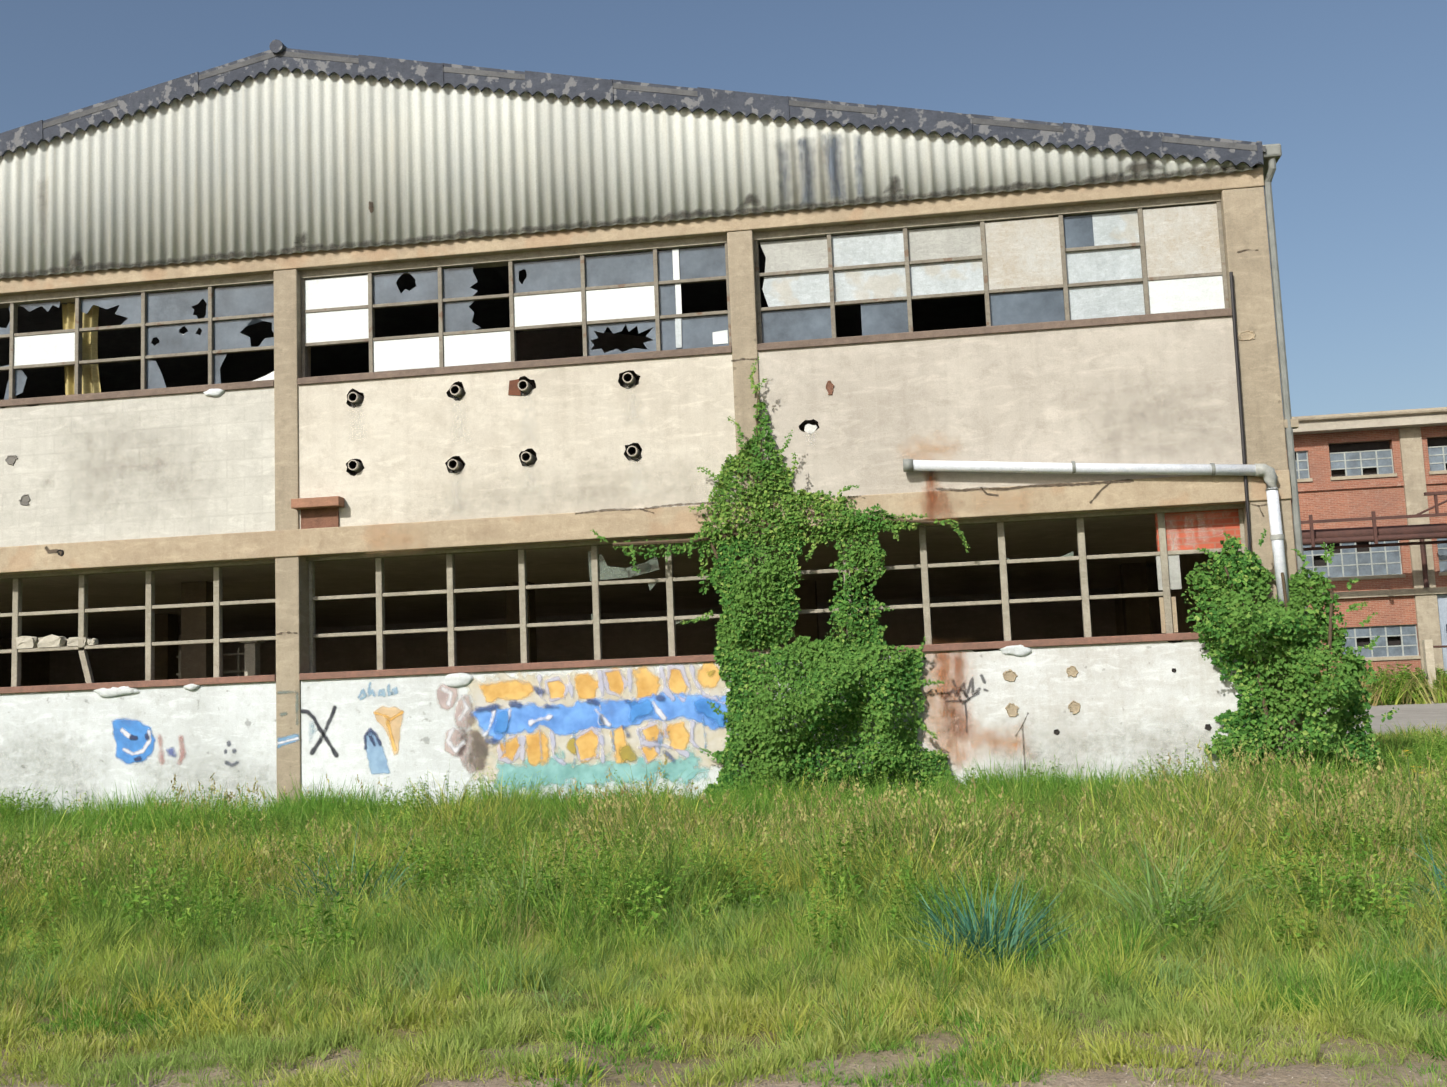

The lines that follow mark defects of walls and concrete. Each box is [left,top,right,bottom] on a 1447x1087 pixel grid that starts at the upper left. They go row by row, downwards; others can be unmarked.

damp [0,137,1245,277]
corrosion [928,473,947,514]
corrosion [937,654,966,733]